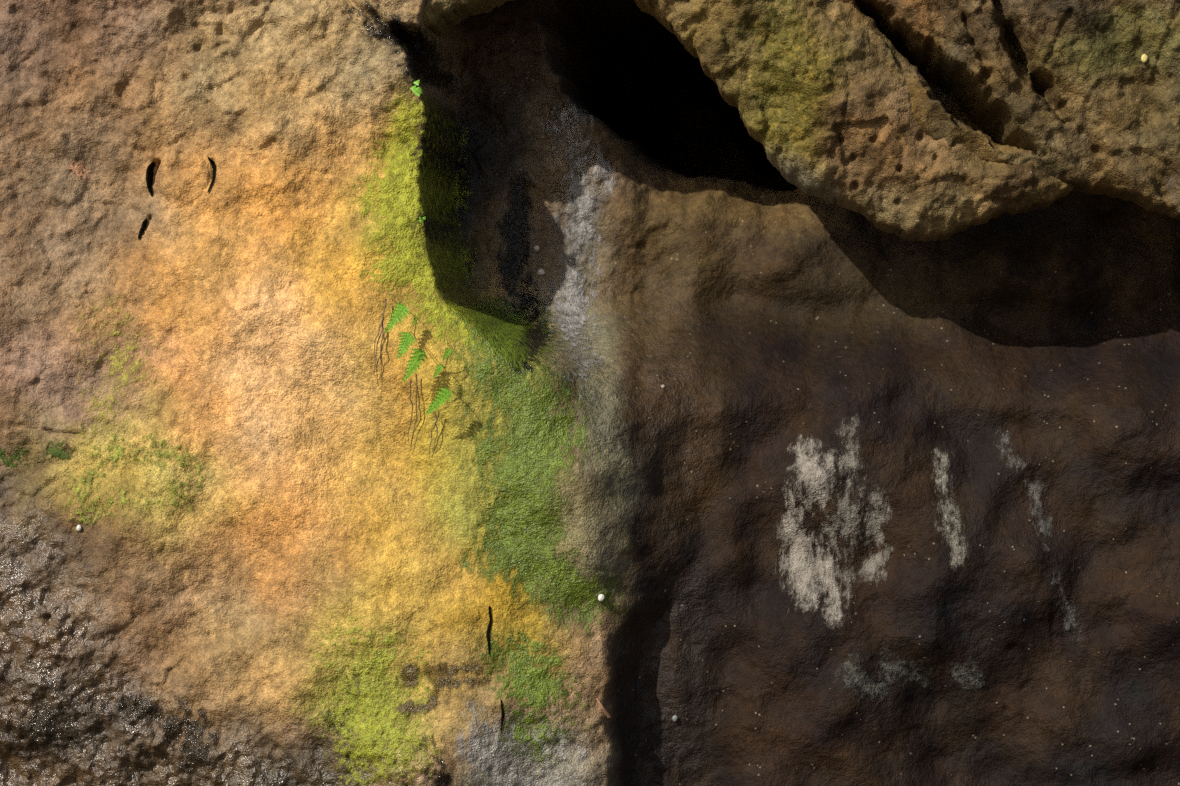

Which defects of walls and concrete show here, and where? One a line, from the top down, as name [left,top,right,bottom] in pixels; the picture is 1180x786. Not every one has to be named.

leakage [778,417,893,626]
leakage [933,449,965,567]